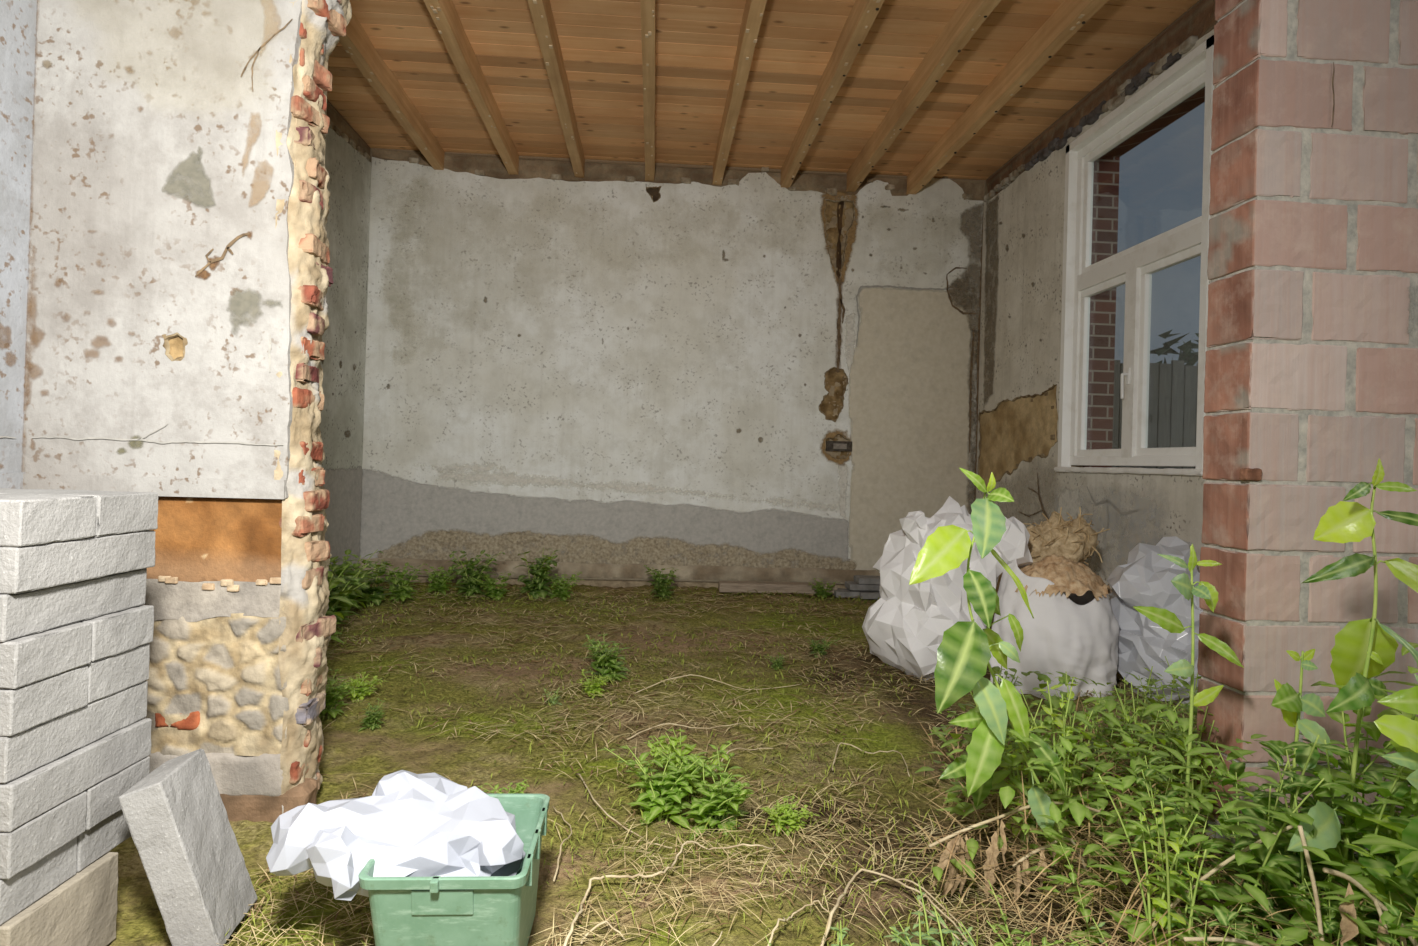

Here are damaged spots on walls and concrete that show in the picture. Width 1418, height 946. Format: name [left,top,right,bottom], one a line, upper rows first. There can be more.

rust [196,256,219,280]
spalling [143,0,908,823]
flaking render [977,384,1058,490]